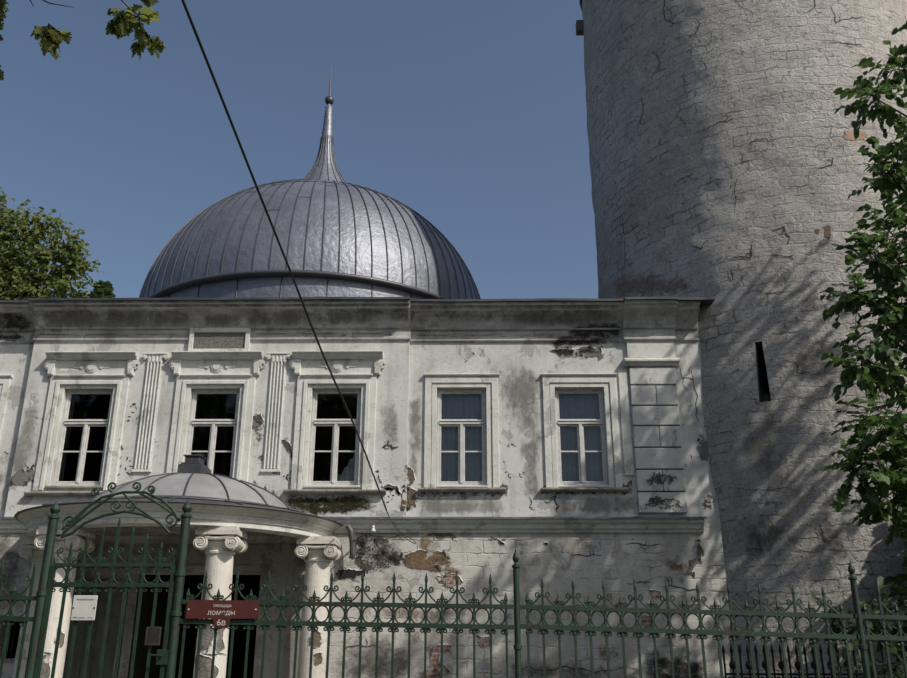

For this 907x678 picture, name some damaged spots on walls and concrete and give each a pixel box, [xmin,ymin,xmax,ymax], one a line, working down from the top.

crack [805,0,866,47]
crack [734,138,774,208]
crack [771,226,794,259]
crack [729,245,783,294]
water stain [0,313,30,342]
flaking render [550,345,605,361]
water stain [506,372,536,429]
peeling [10,464,35,487]
water stain [524,442,537,493]
water stain [309,499,355,514]
flaking render [398,533,463,589]
flaking render [685,539,705,579]